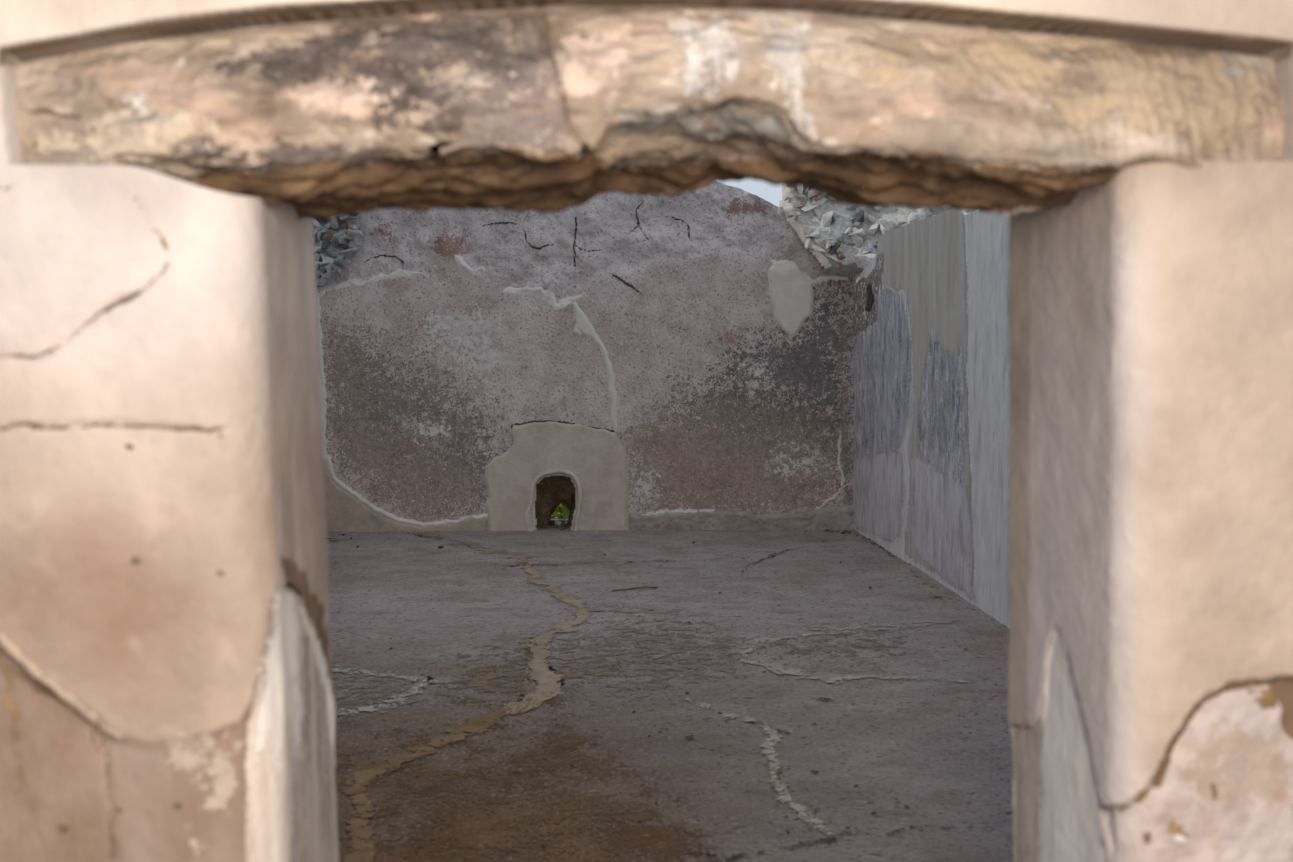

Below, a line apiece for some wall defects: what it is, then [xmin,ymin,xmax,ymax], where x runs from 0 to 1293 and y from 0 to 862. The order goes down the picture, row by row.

water stain [288,75,404,127]
water stain [554,5,824,154]
water stain [845,20,1283,161]
crack [3,198,168,359]
crack [482,217,642,294]
water stain [721,195,770,225]
spalling [771,254,884,337]
crack [0,422,226,437]
peeling [0,582,339,862]
crack [332,531,680,862]
crack [684,698,971,862]
spalling [1009,623,1293,862]